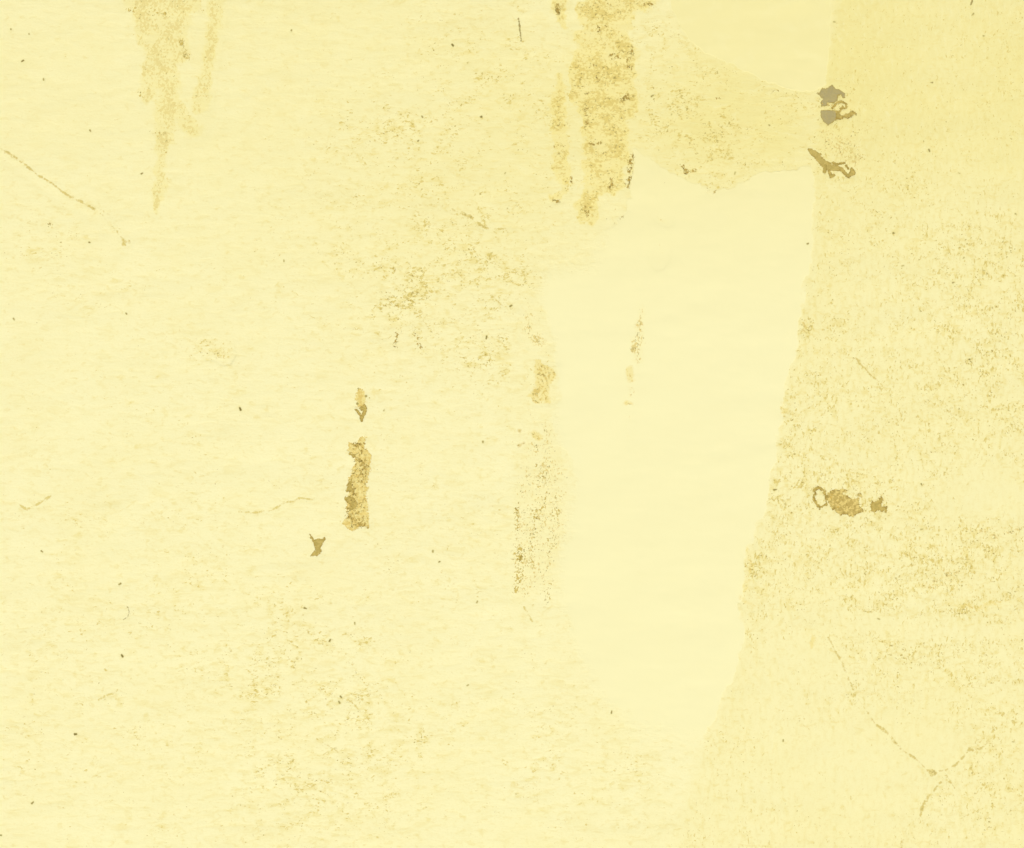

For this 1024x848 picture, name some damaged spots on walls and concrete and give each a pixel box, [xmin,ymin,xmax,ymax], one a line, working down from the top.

damp [119,0,232,220]
damp [542,0,663,232]
peeling [635,5,877,199]
spalling [307,531,328,558]
spalling [338,385,374,533]
spalling [812,484,888,519]